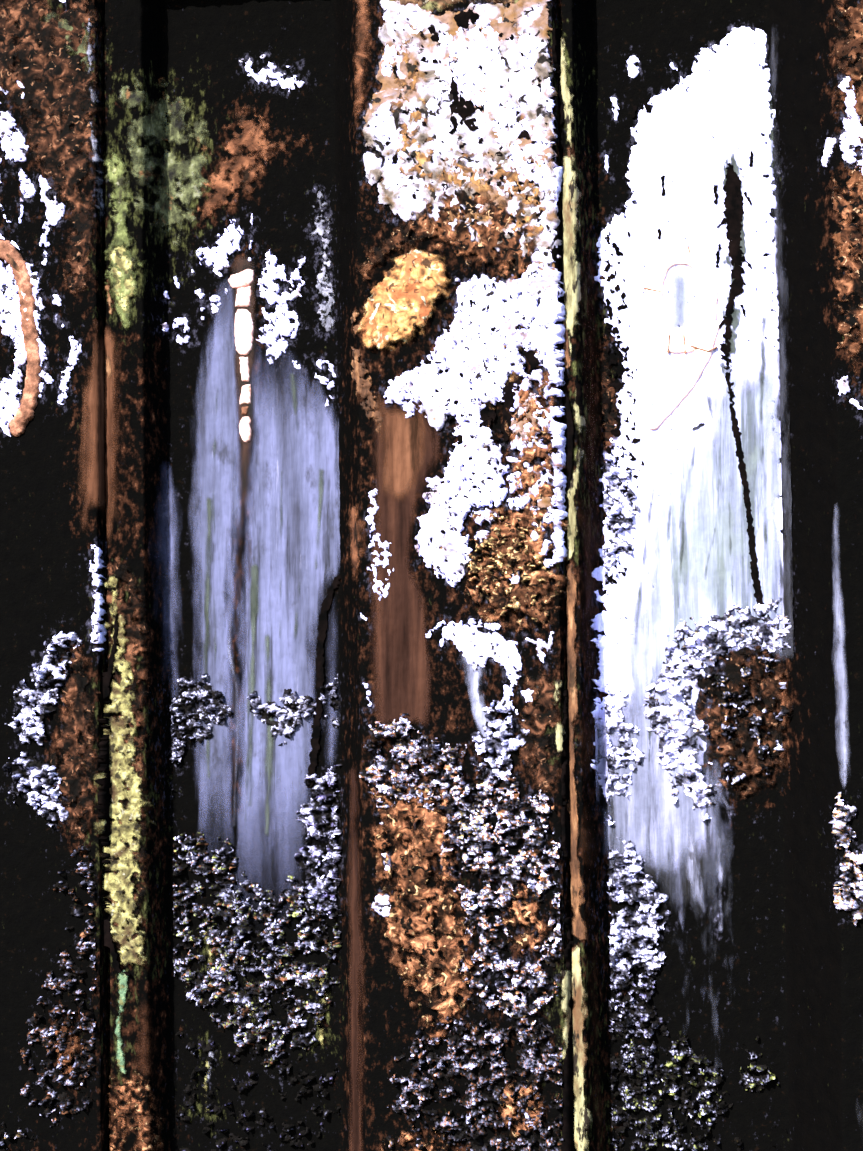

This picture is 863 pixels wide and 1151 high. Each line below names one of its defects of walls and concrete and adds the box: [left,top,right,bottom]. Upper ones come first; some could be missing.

peeling [0,80,82,437]
rust [0,0,105,293]
peeling [161,192,335,369]
rust [349,32,551,724]
peeling [363,0,568,601]
rust [563,321,571,368]
peeling [590,26,785,725]
peeling [821,76,863,175]
rust [829,0,863,367]
peeling [837,375,863,410]
rust [349,770,473,1151]
rust [501,1085,540,1136]